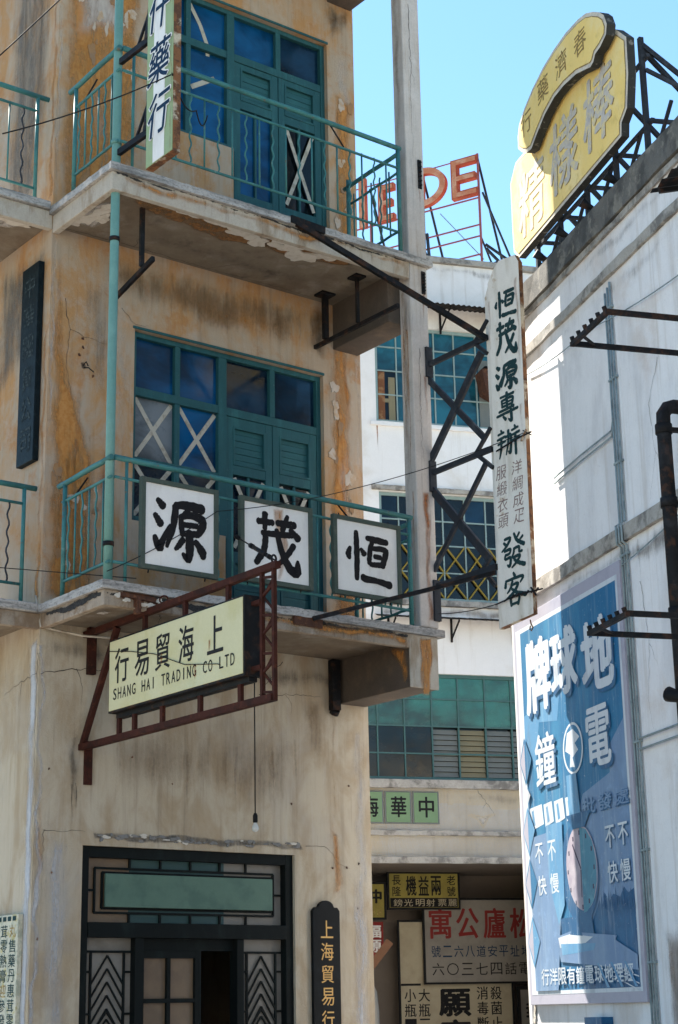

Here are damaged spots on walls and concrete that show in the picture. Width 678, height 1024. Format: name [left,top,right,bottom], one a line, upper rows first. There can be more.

peeling [79,0,137,65]
leakage [13,0,56,193]
peeling [338,99,353,116]
peeling [137,200,349,265]
peeling [329,381,344,436]
peeling [328,448,356,486]
corrosion [421,639,432,694]
crack [7,661,101,895]
peeling [94,833,301,849]